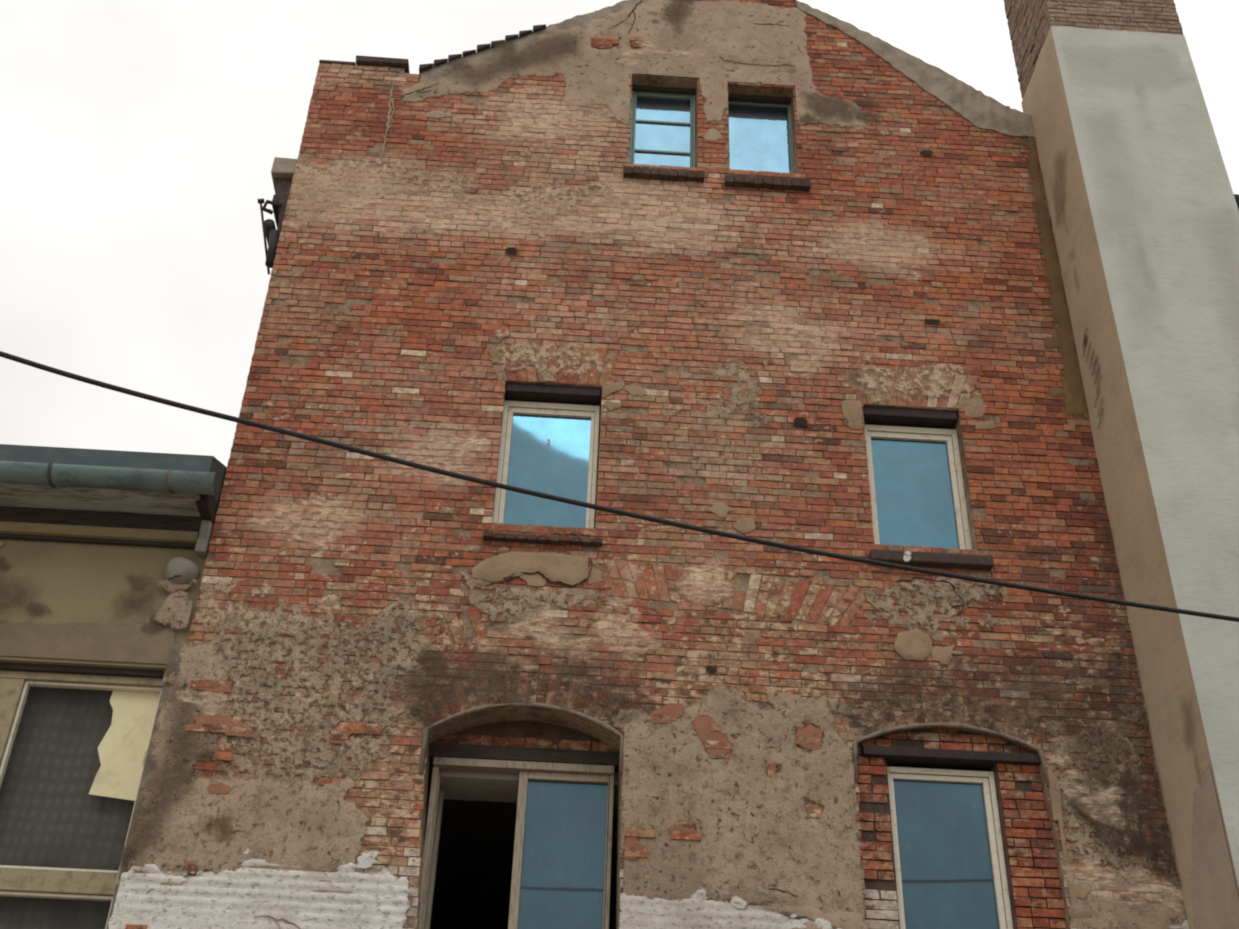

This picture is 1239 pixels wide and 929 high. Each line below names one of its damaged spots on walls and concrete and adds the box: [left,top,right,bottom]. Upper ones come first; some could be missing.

crack [381,83,439,158]
peeling [401,0,890,141]
peeling [0,577,433,929]
peeling [611,666,868,929]